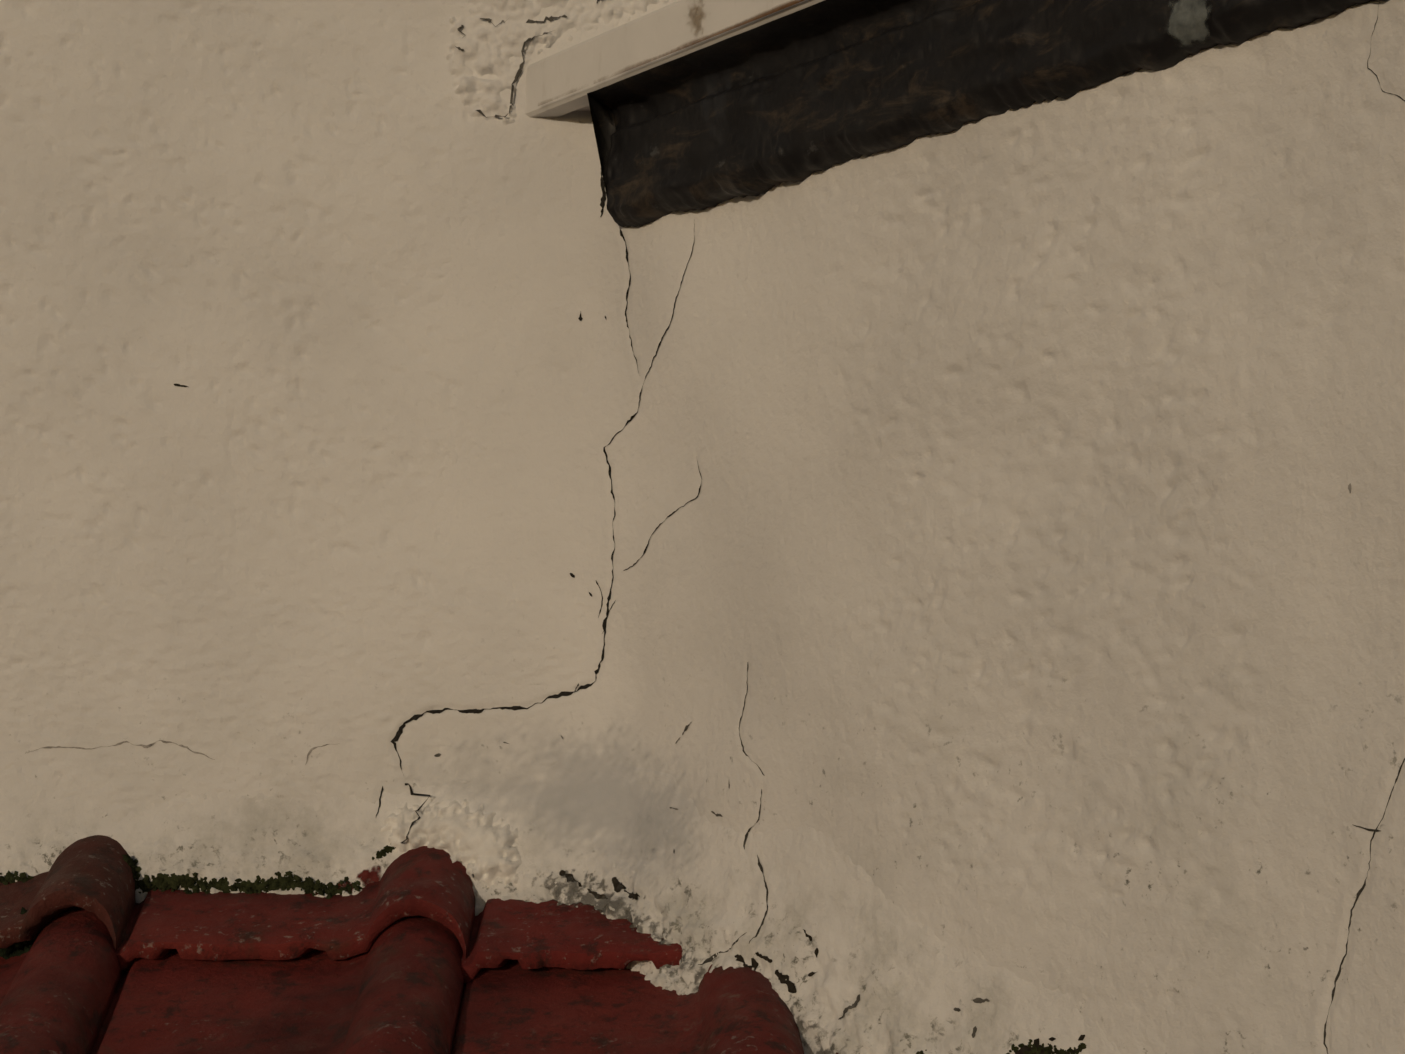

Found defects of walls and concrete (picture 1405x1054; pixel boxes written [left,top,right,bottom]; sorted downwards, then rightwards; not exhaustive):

crack [476,30,555,117]
crack [1367,1,1405,101]
crack [376,170,702,843]
crack [698,663,768,965]
crack [1323,758,1405,1054]